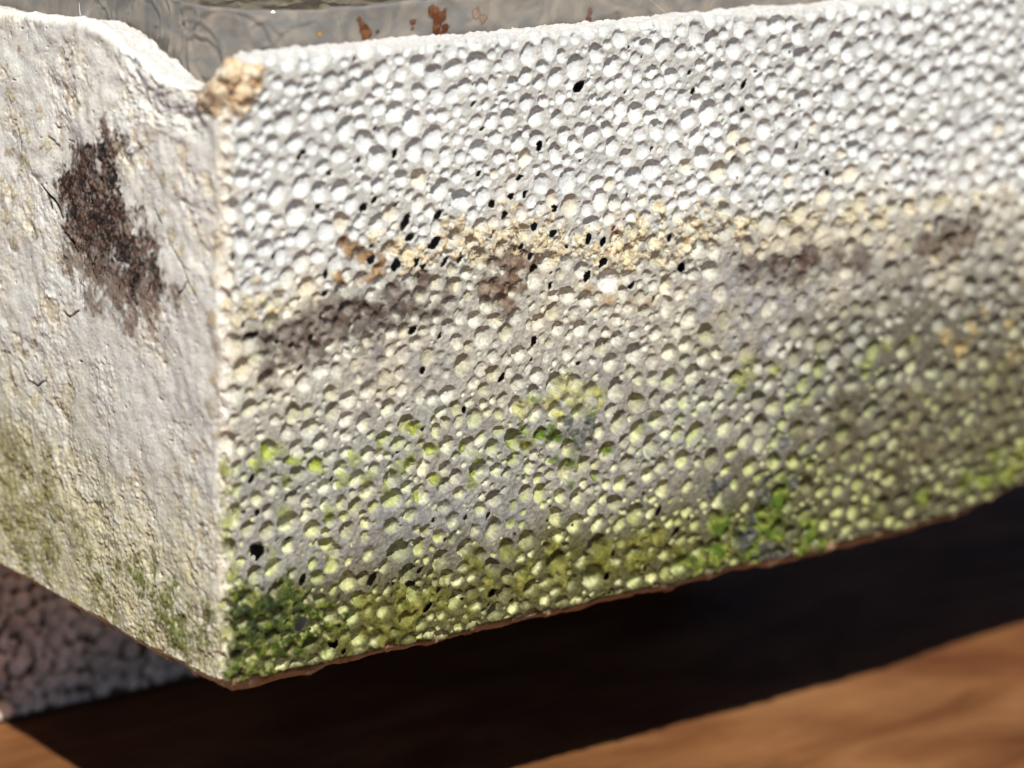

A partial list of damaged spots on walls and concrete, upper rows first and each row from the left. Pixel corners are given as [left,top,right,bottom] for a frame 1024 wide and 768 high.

damp [563,415,597,450]
damp [825,390,865,470]
damp [708,475,733,496]
damp [736,474,789,561]